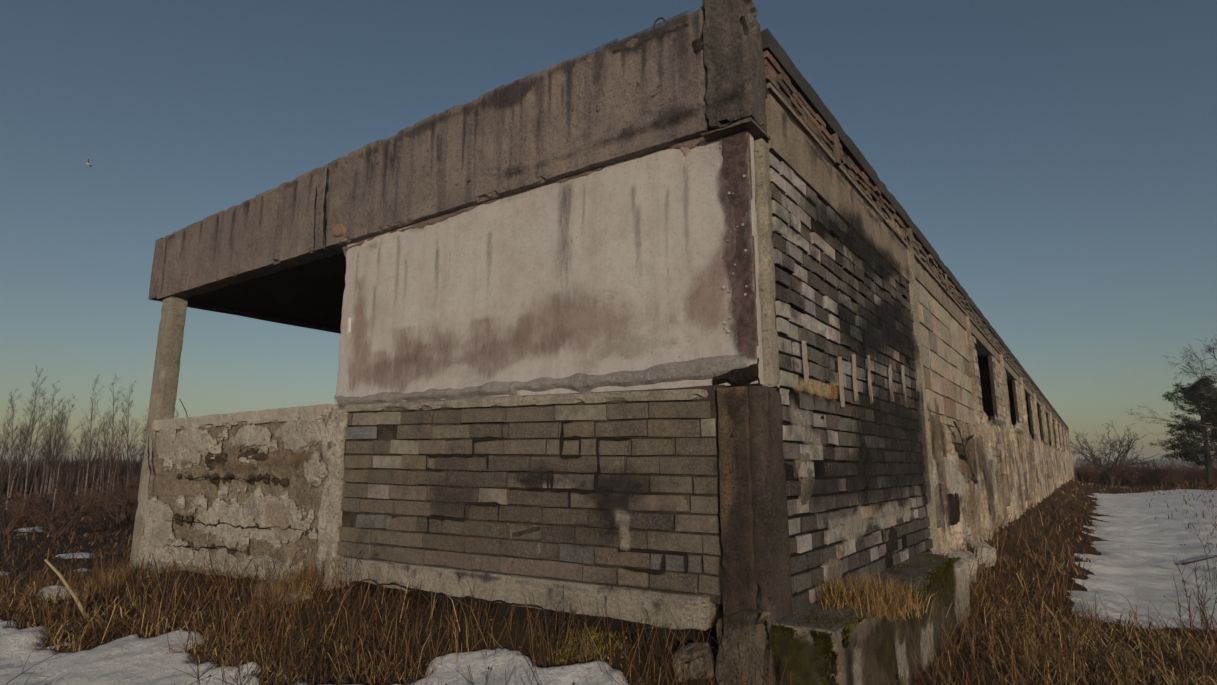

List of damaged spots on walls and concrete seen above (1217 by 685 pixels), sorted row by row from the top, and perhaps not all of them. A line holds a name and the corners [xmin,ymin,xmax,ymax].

damp [462,11,699,152]
flaking render [156,418,328,488]
flaking render [135,485,320,586]
damp [852,565,969,685]